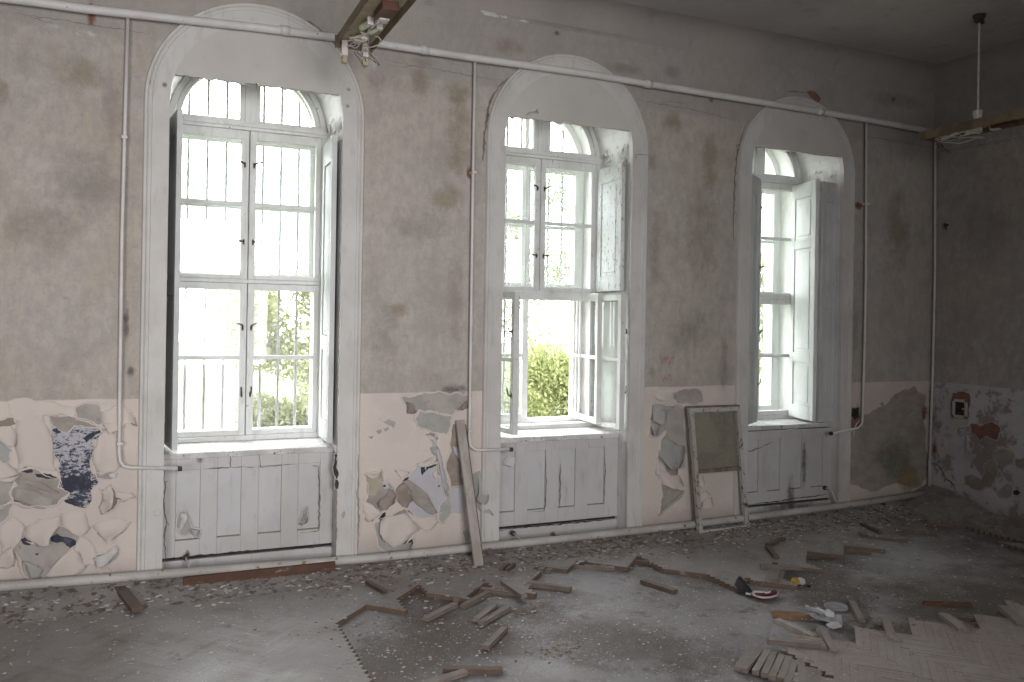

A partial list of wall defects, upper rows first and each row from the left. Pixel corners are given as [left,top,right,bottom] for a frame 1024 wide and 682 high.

crack [639,99,748,241]
peeling [0,398,139,579]
peeling [361,391,493,552]
peeling [648,388,728,516]
peeling [850,385,929,493]
flaking render [950,390,1001,441]
peeling [964,459,1021,499]